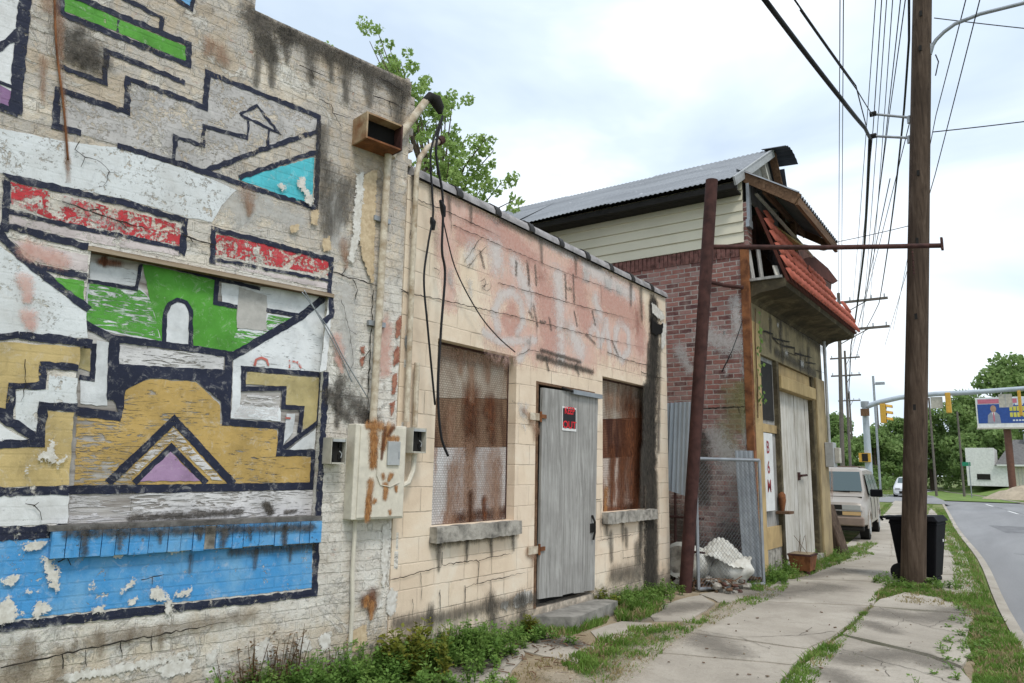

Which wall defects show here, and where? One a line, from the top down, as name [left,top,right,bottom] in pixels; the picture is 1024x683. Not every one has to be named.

leakage [240,0,412,124]
crack [62,141,146,229]
peeling [193,170,378,283]
leakage [501,219,602,274]
peeling [334,283,366,381]
corrosion [444,370,505,524]
corrosion [603,393,644,512]
leakage [602,283,746,590]
peeling [0,541,62,642]
peeling [119,577,192,618]
corrosion [362,589,376,621]